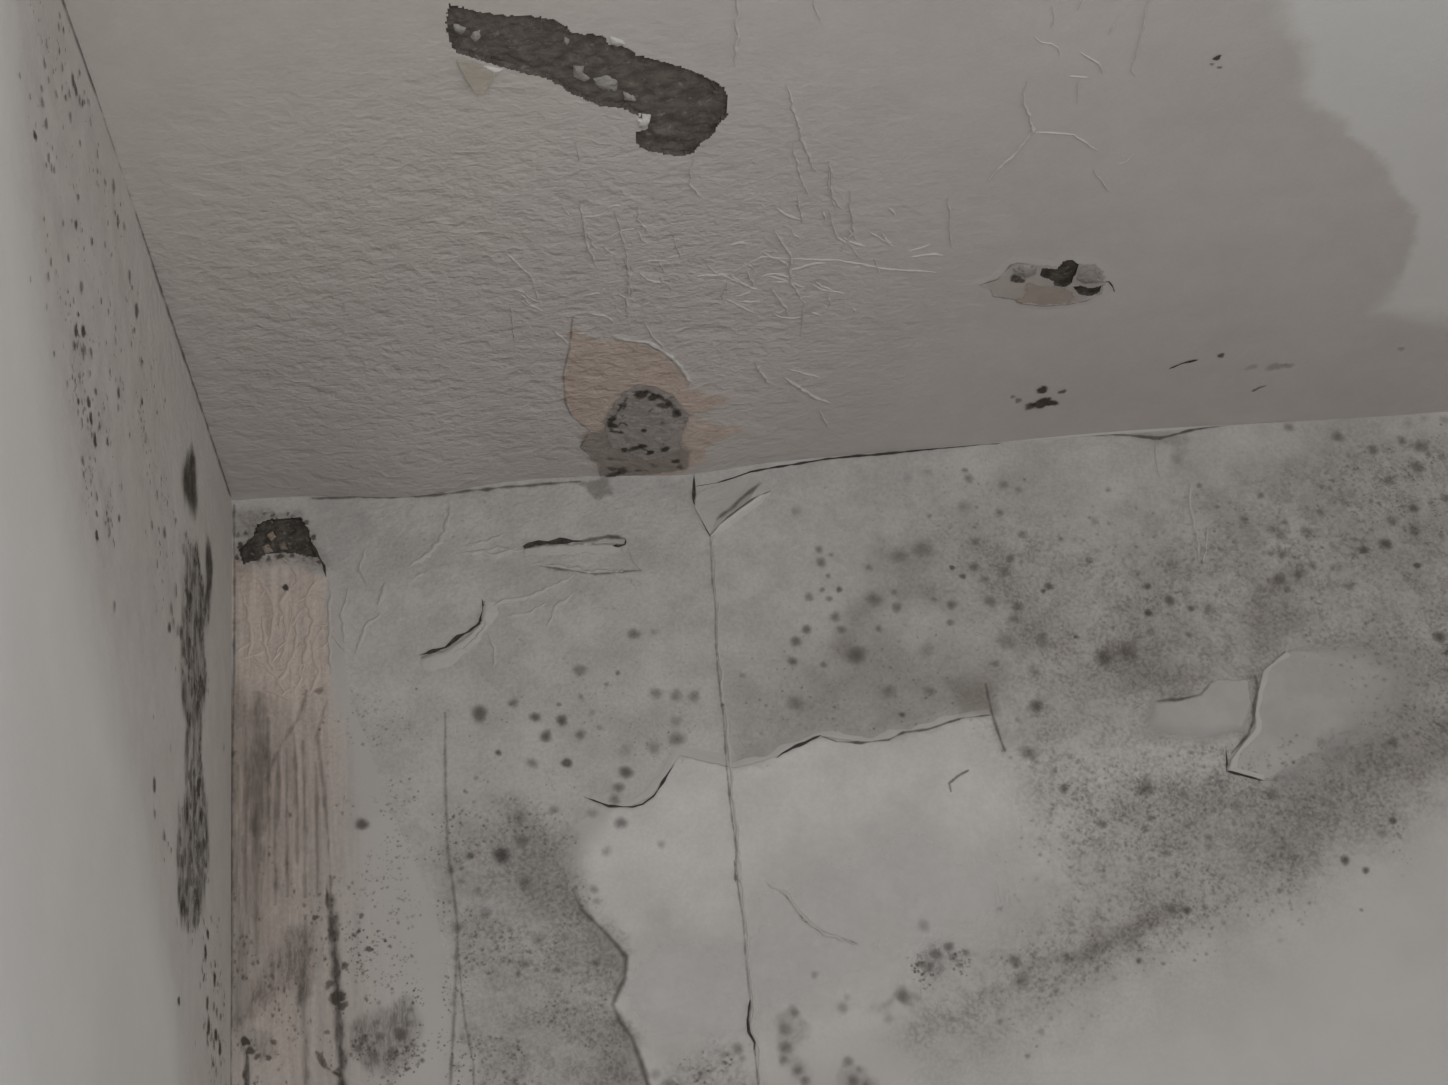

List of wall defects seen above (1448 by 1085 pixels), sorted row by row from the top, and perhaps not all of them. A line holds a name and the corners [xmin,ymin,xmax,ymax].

spalling [446,3,728,152]
peeling [553,310,766,498]
crack [504,84,943,347]
water stain [64,0,1448,500]
peeling [969,257,1116,310]
crack [986,0,1150,190]
water stain [0,0,232,1085]
spalling [235,515,326,576]
water stain [232,411,1448,1085]
peeling [549,648,1396,1085]
crack [692,363,1282,1085]